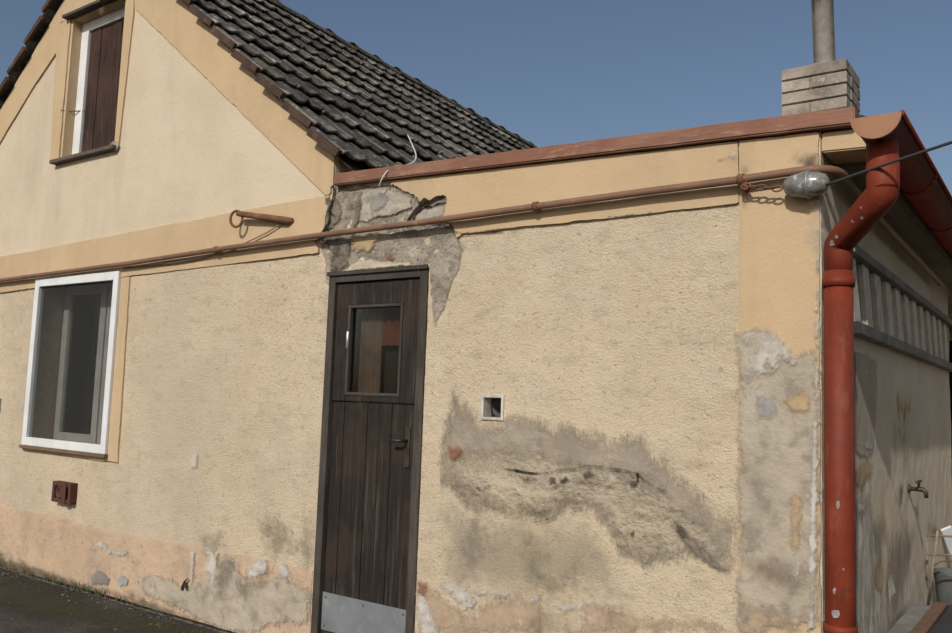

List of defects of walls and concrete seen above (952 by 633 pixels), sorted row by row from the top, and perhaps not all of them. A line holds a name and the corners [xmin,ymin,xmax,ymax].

flaking render [319,184,462,325]
peeling [439,289,822,633]
flaking render [91,571,128,586]
flaking render [142,551,312,633]
peeling [416,593,438,633]